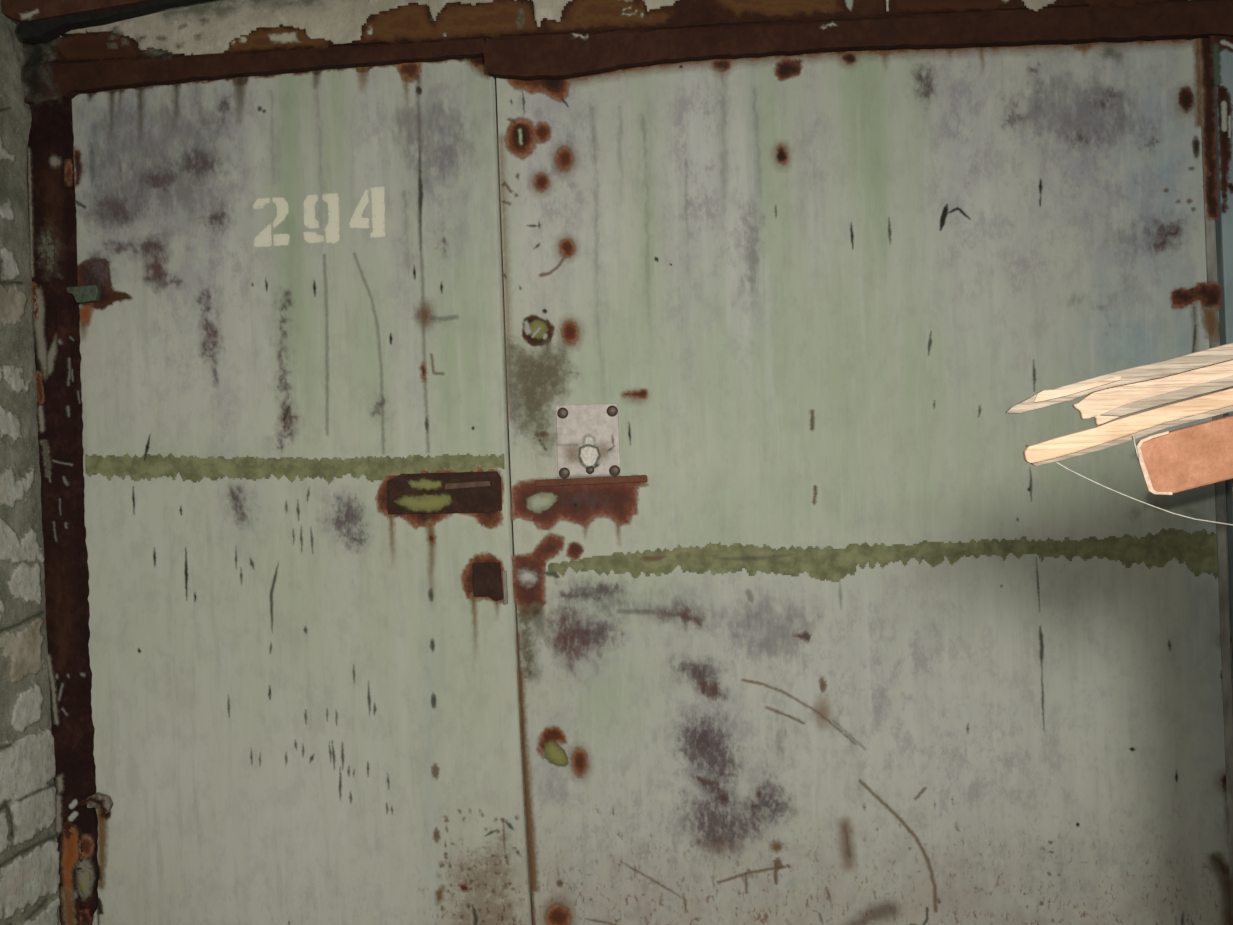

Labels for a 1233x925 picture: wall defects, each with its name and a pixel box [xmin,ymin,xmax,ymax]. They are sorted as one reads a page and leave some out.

spalling [56,31,138,63]
spalling [224,25,329,55]
spalling [358,0,674,44]
spalling [714,0,853,29]
corrosion [41,150,86,273]
corrosion [77,258,131,329]
corrosion [522,309,578,346]
corrosion [1171,282,1222,340]
corrosion [376,467,647,925]
corrosion [61,808,111,925]